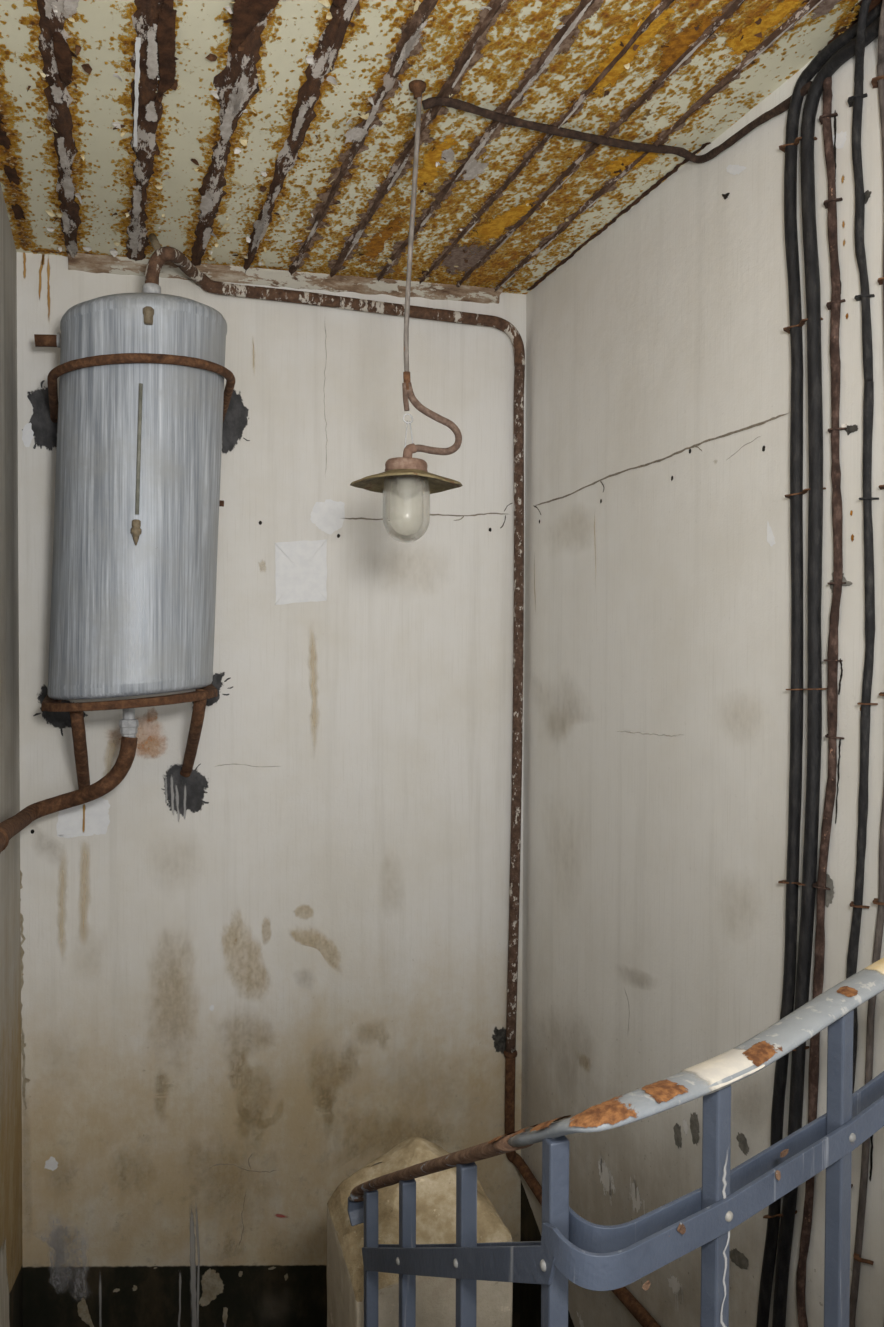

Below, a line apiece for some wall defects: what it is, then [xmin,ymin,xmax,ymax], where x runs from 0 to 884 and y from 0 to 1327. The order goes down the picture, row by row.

peeling [27,0,92,108]
peeling [136,24,181,133]
peeling [344,97,392,144]
rust [0,0,883,318]
peeling [436,148,489,182]
peeling [45,206,64,252]
peeling [232,212,285,266]
crack [345,414,786,528]
peeling [0,1240,10,1327]